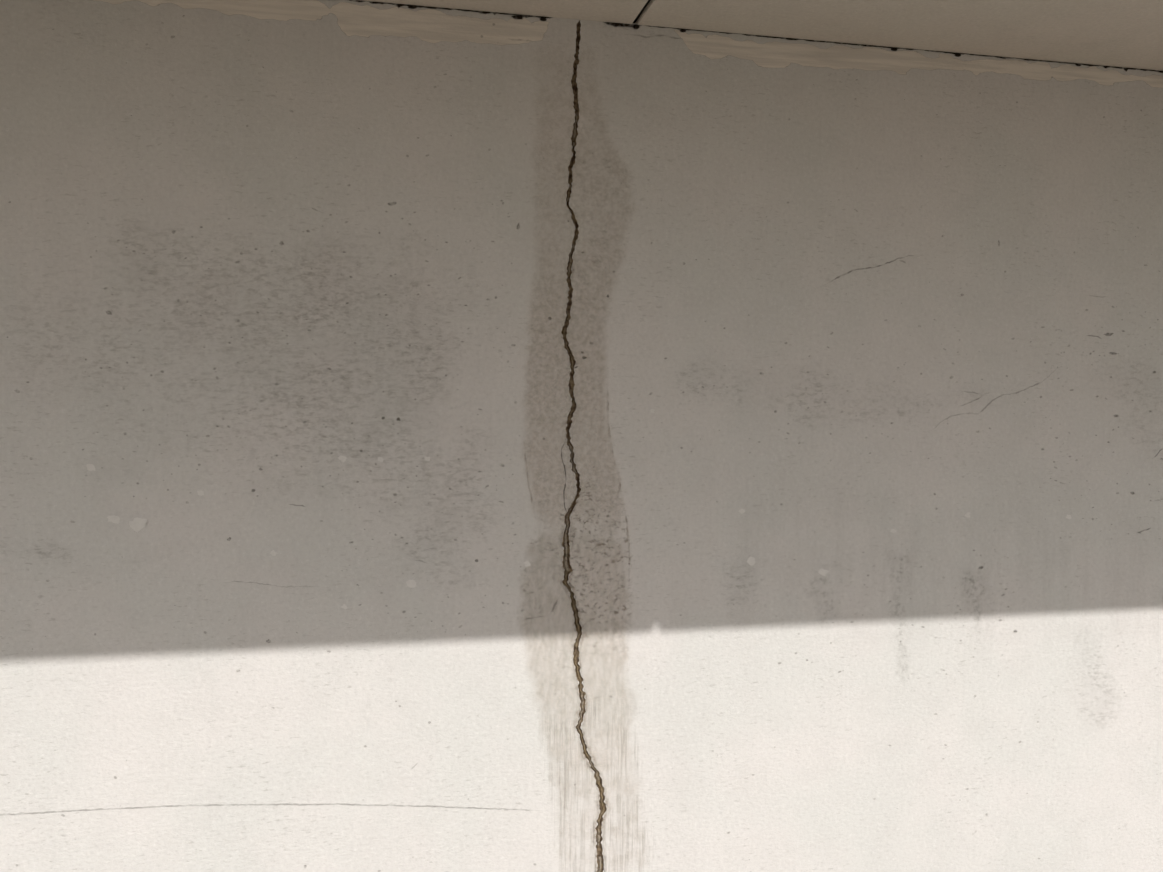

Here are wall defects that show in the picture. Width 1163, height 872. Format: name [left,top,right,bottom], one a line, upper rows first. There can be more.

crack [349,0,1163,872]